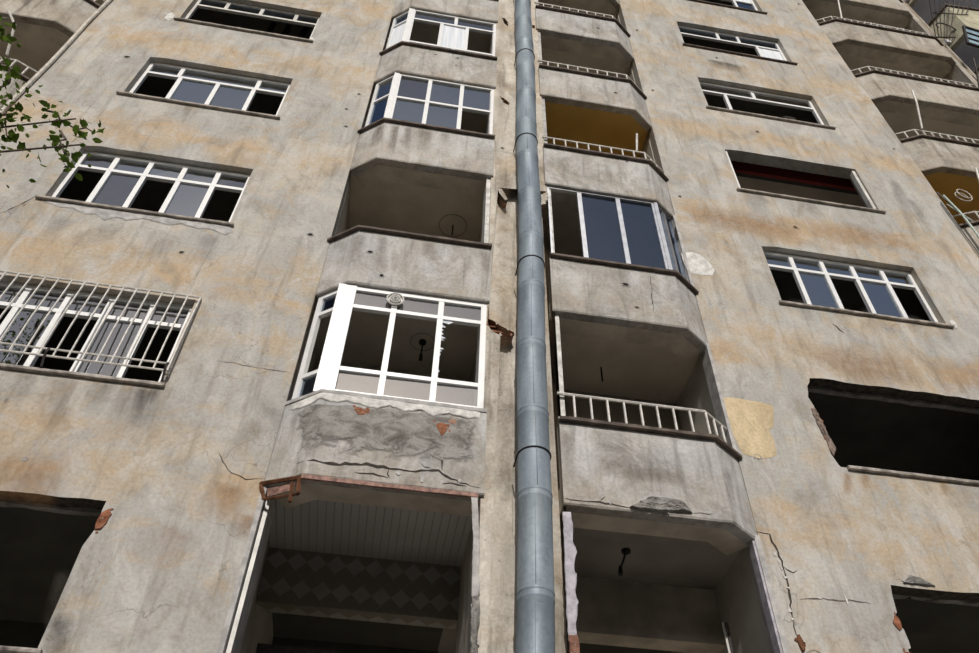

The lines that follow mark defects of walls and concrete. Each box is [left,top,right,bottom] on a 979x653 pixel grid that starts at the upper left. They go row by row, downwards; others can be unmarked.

spalling [486,316,514,341]
flaking render [291,392,480,461]
flaking render [563,512,578,635]
crack [756,531,867,653]